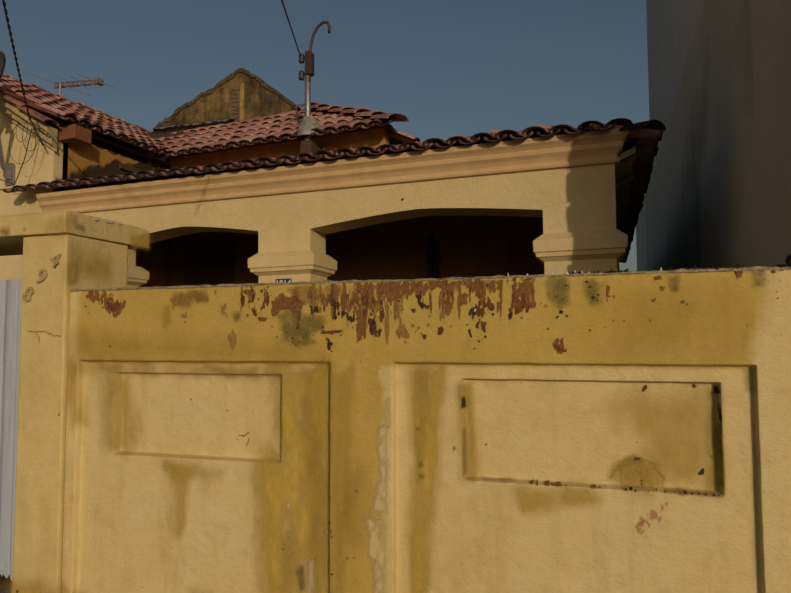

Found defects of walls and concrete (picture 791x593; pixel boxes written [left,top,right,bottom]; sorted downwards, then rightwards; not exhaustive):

peeling [85,290,126,317]
peeling [240,277,547,352]
spalling [553,338,567,354]
water stain [412,368,443,593]